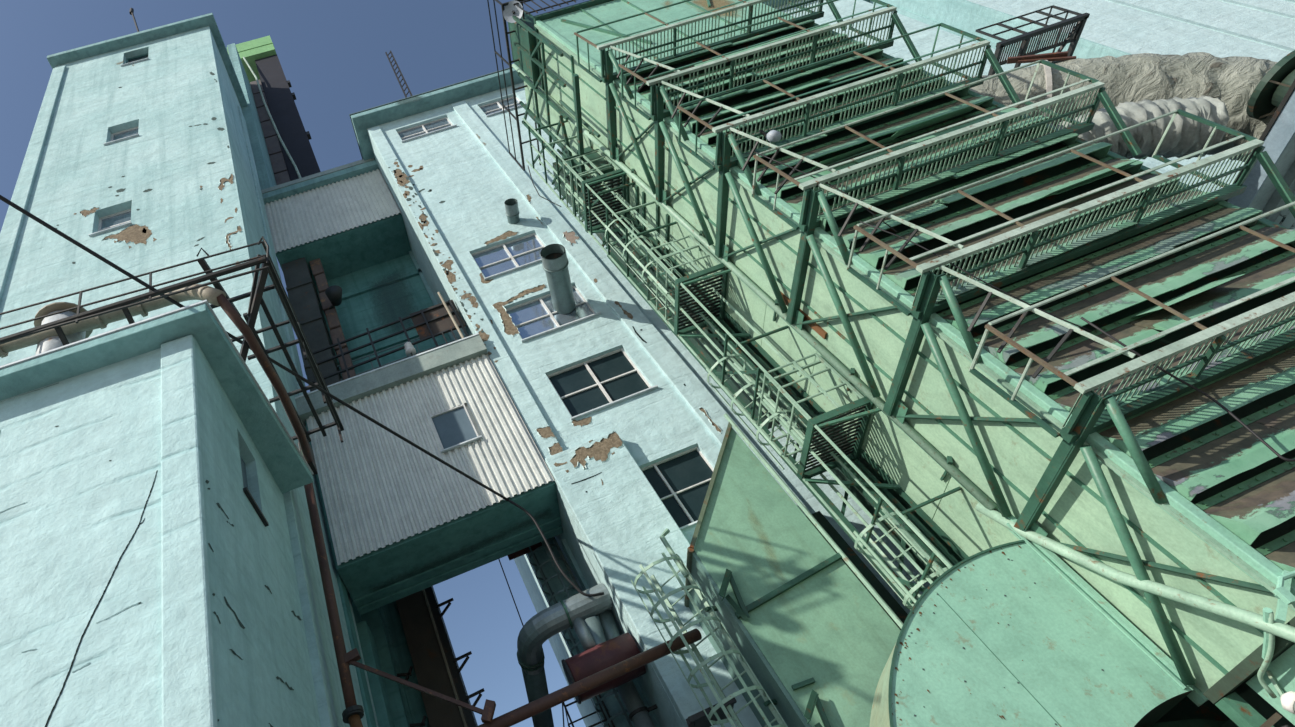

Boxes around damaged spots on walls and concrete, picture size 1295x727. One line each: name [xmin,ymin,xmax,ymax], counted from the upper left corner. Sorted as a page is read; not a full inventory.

peeling [103,209,157,248]
flaking render [200,174,242,265]
flaking render [388,159,546,362]
flaking render [535,417,624,473]
crack [45,470,158,727]